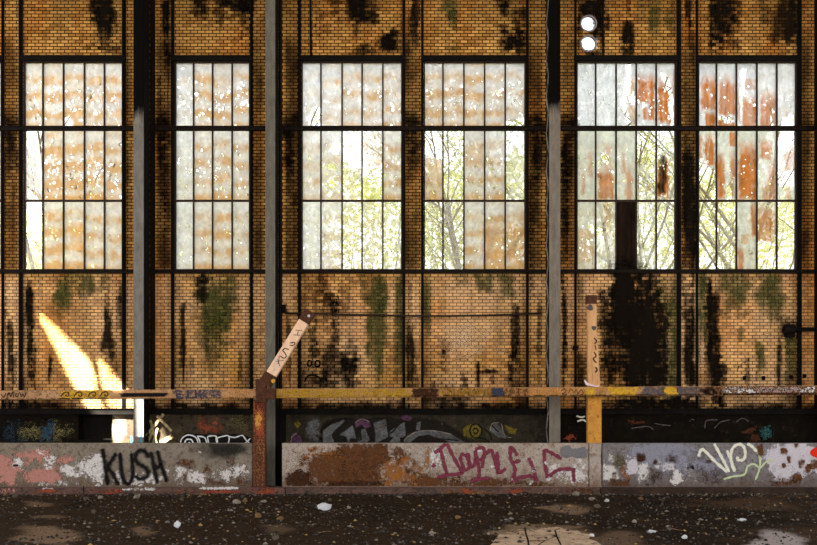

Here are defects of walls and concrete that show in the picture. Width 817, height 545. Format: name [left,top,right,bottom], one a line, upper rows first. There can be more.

damp [760,0,797,44]
damp [193,273,208,305]
damp [754,273,786,316]
damp [24,282,37,390]
damp [100,283,122,362]
damp [308,319,327,389]
damp [341,353,358,388]
damp [598,257,669,399]
damp [682,273,728,386]
peeling [0,446,249,494]
rust [284,444,554,494]
peeling [761,444,817,482]